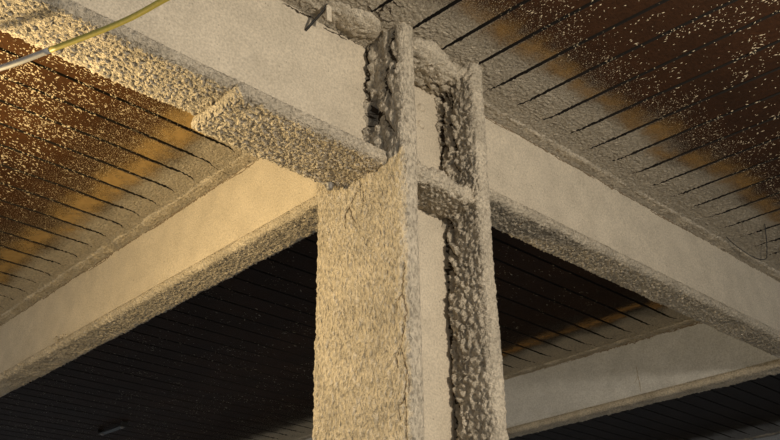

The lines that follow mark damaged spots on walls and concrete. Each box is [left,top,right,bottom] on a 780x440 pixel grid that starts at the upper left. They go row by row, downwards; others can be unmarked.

corrosion [58,112,203,231]
spalling [374,89,386,135]
corrosion [0,231,53,282]
crack [396,263,410,439]